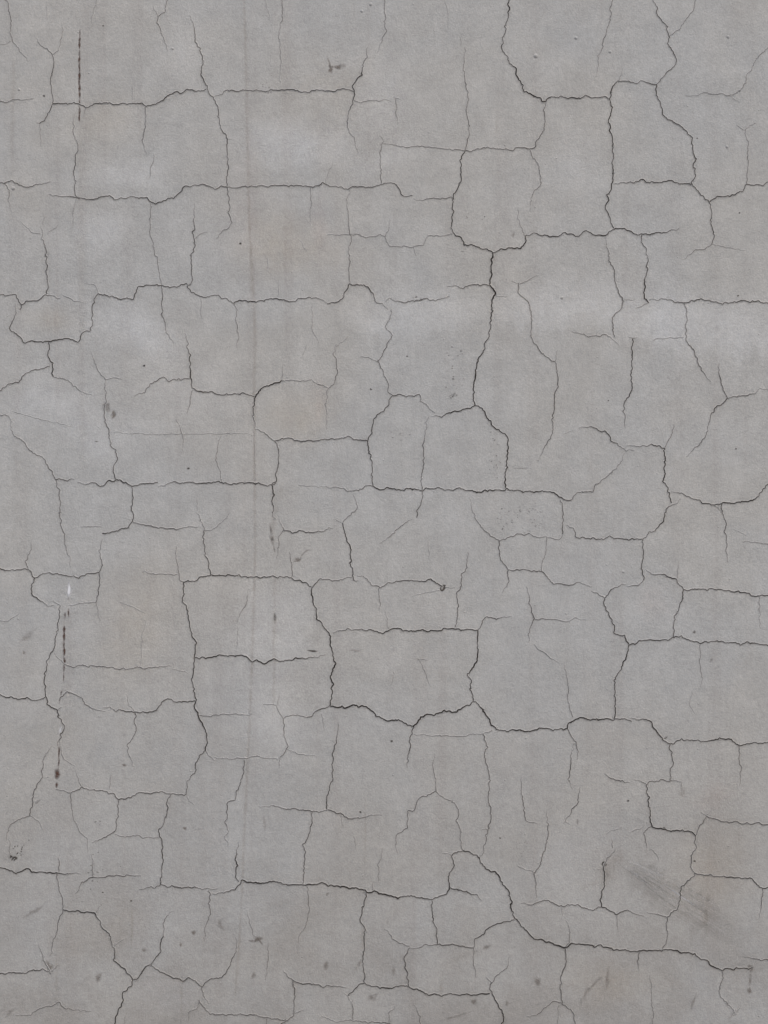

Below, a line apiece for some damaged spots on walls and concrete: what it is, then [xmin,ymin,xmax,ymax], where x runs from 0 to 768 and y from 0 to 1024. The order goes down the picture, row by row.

crack [0,0,29,62]
crack [153,0,169,52]
crack [377,0,388,53]
crack [0,15,428,395]
crack [384,0,768,405]
crack [512,273,559,461]
crack [0,414,75,567]
crack [0,539,188,767]
crack [56,304,768,1024]
crack [6,746,52,853]
crack [0,855,238,1024]